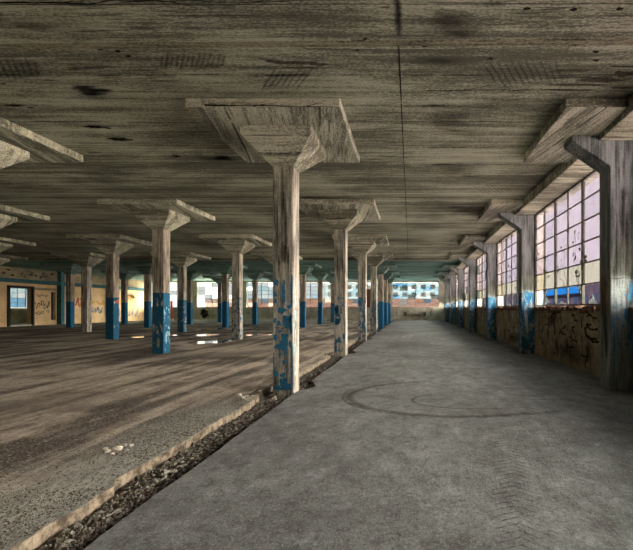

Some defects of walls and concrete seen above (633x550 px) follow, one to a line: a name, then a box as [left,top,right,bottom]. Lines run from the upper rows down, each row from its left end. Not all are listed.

water stain [75,86,108,95]
crack [384,46,418,242]
peeling [152,292,170,348]
peeling [273,274,296,392]
peeling [335,296,345,325]
peeling [477,291,534,350]